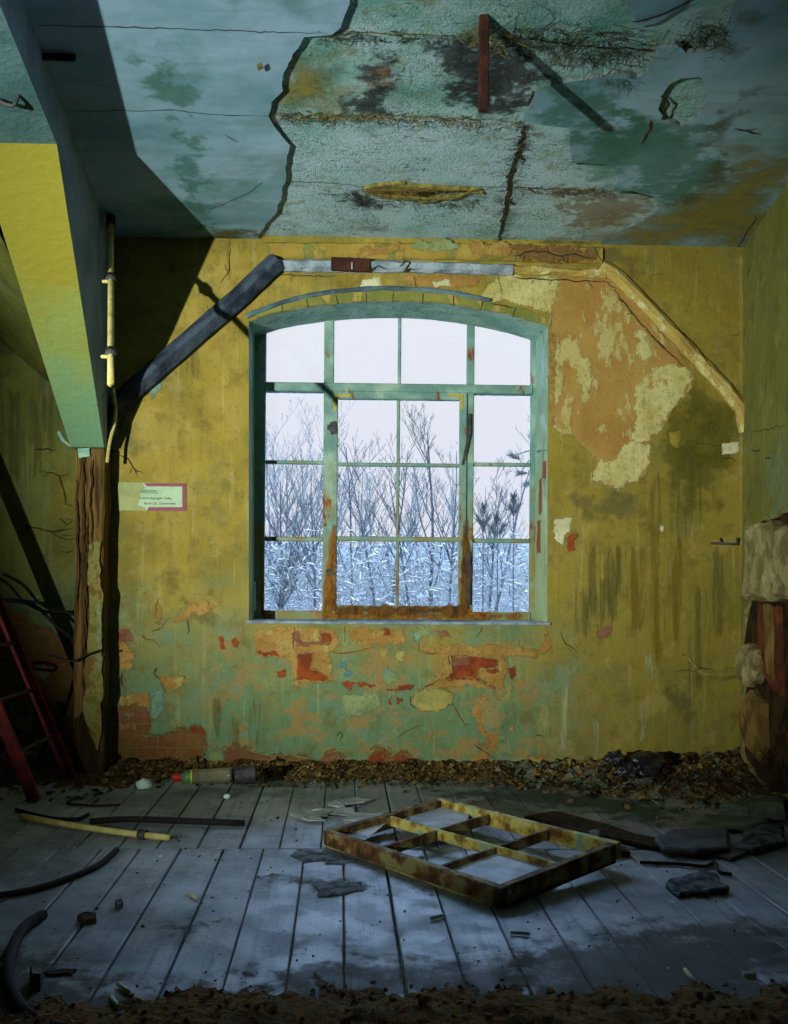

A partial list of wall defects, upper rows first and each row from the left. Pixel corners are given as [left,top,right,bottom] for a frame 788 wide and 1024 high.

damp [423,36,550,115]
crack [277,84,692,367]
peeling [256,237,723,491]
rust [323,523,521,620]
flaking render [102,600,788,812]